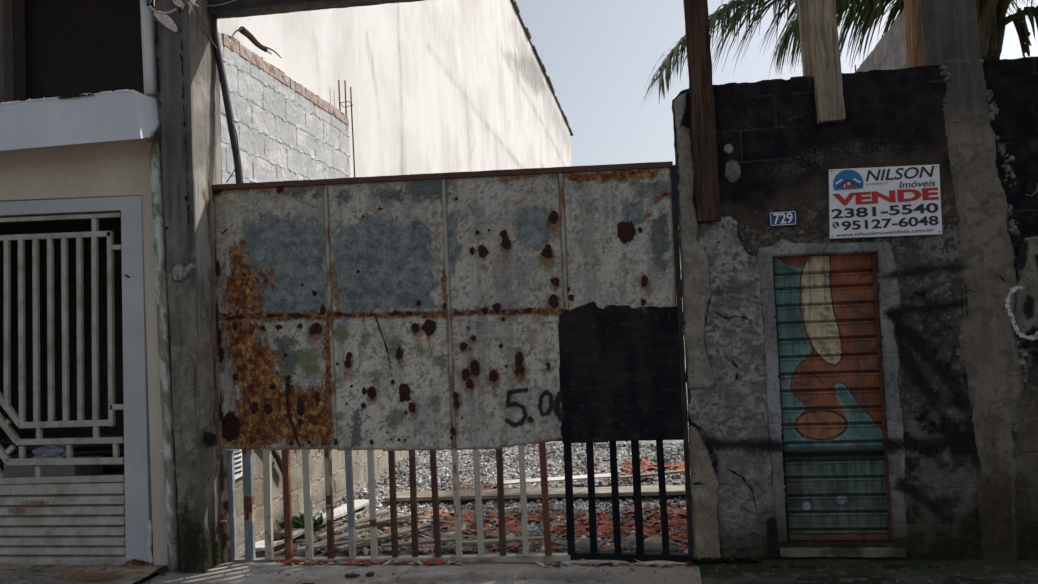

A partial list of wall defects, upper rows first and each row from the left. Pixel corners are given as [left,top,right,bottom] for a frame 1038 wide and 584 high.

corrosion [492,168,661,184]
corrosion [546,208,562,232]
corrosion [617,188,671,244]
corrosion [470,229,512,258]
corrosion [638,275,651,312]
corrosion [209,240,574,456]